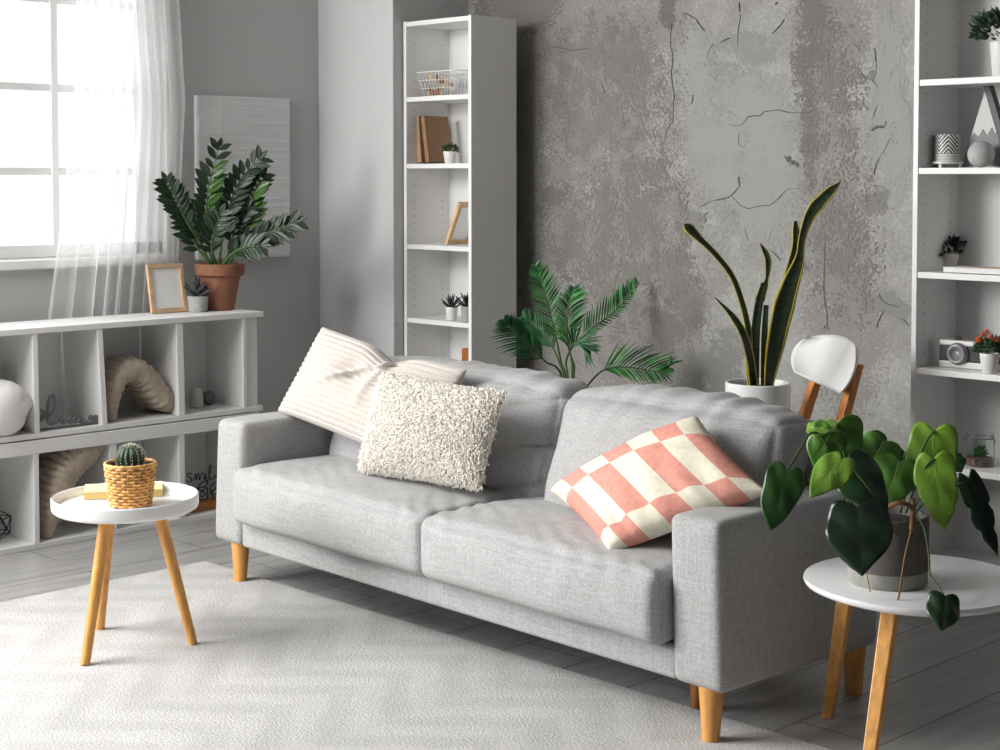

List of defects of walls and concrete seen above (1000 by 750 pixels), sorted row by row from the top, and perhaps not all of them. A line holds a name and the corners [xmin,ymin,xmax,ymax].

crack [665,2,740,139]
crack [861,48,877,117]
crack [732,109,800,147]
crack [700,187,794,240]